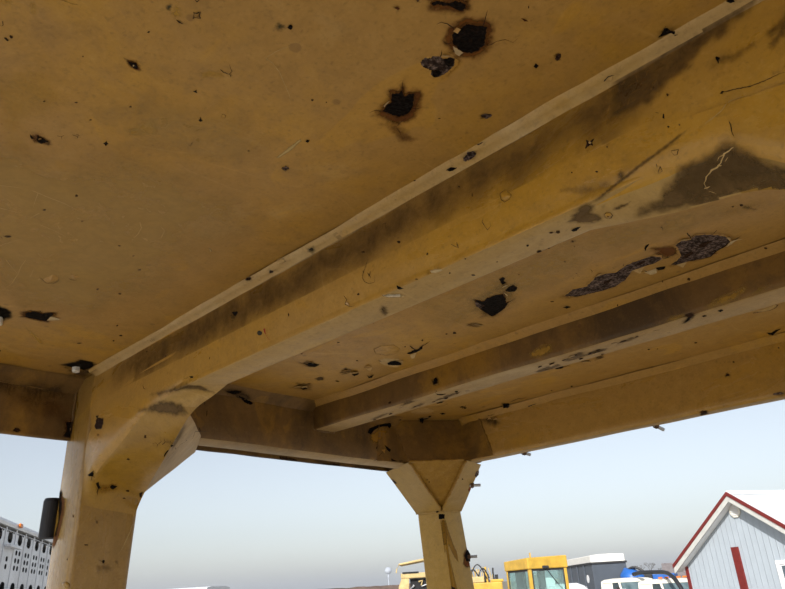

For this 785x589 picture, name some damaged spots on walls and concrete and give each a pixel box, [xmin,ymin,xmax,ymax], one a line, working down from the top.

peeling [417,46,463,79]
damp [639,146,785,215]
crack [704,122,734,194]
peeling [563,230,742,309]